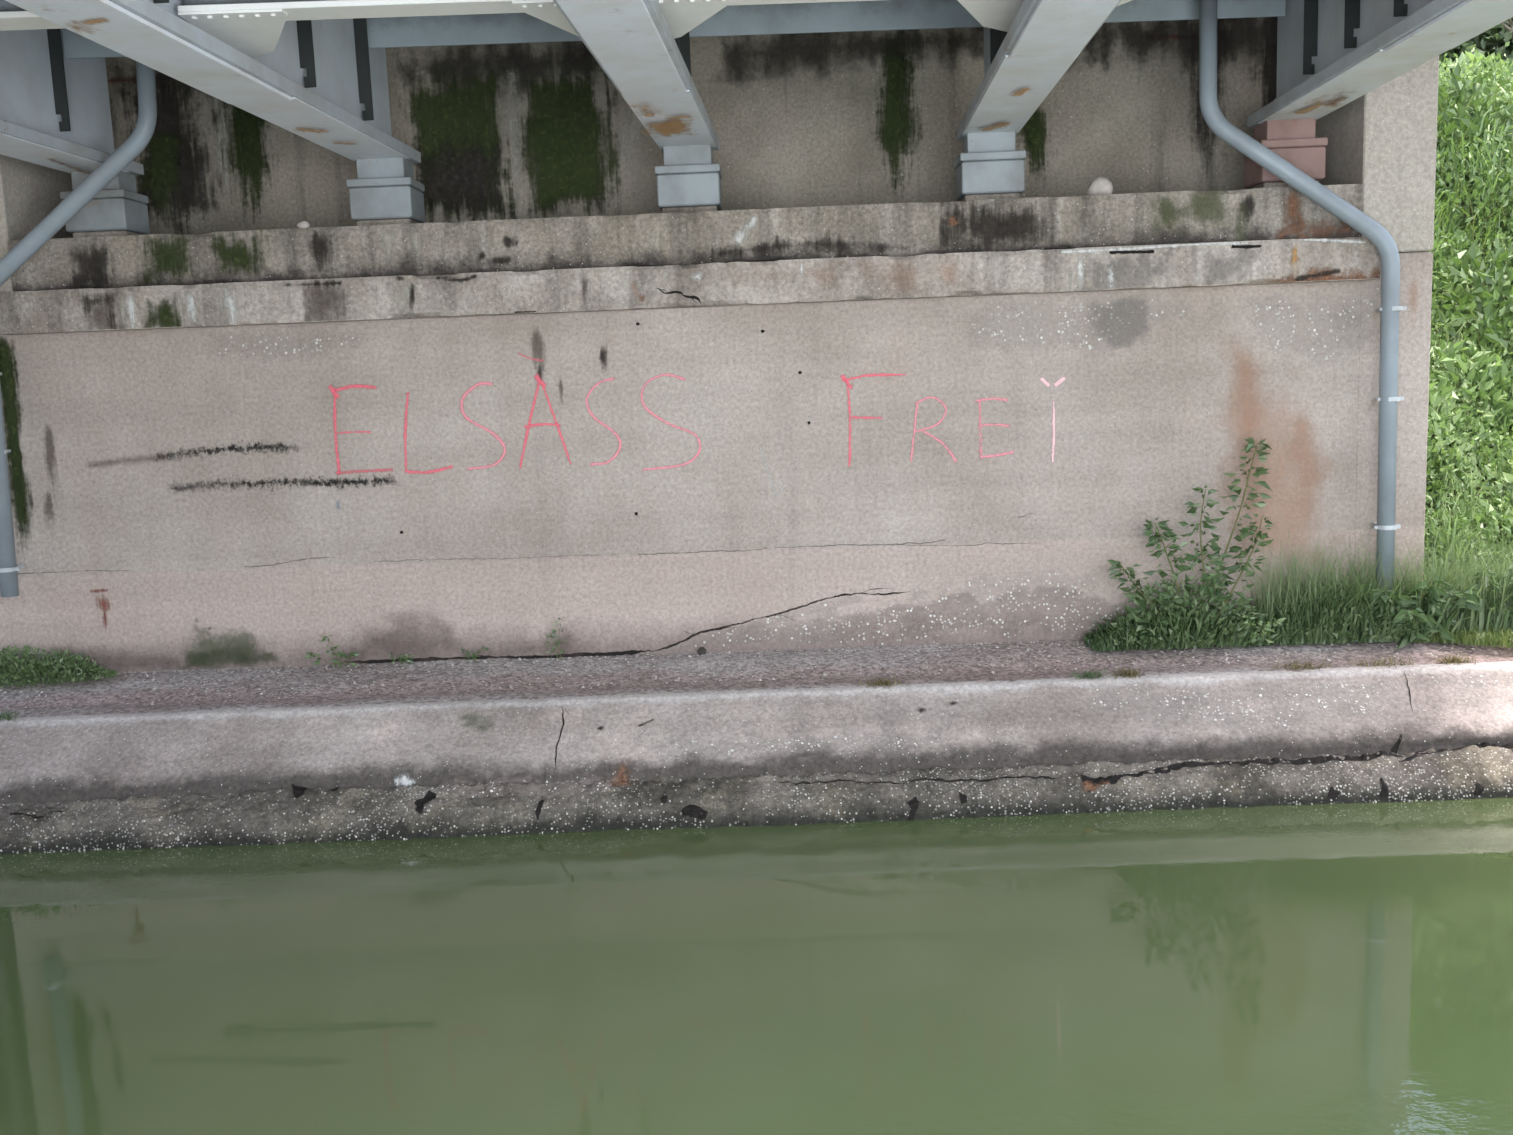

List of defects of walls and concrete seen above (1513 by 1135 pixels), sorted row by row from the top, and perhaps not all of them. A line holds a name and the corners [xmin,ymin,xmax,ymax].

damp [402,41,599,221]
corrosion [633,106,692,137]
damp [724,27,984,182]
damp [940,204,1053,251]
damp [436,237,517,282]
damp [394,276,415,309]
crack [378,513,1034,562]
crack [19,568,129,576]
crack [244,557,336,567]
crack [343,588,910,664]
crack [553,708,564,783]